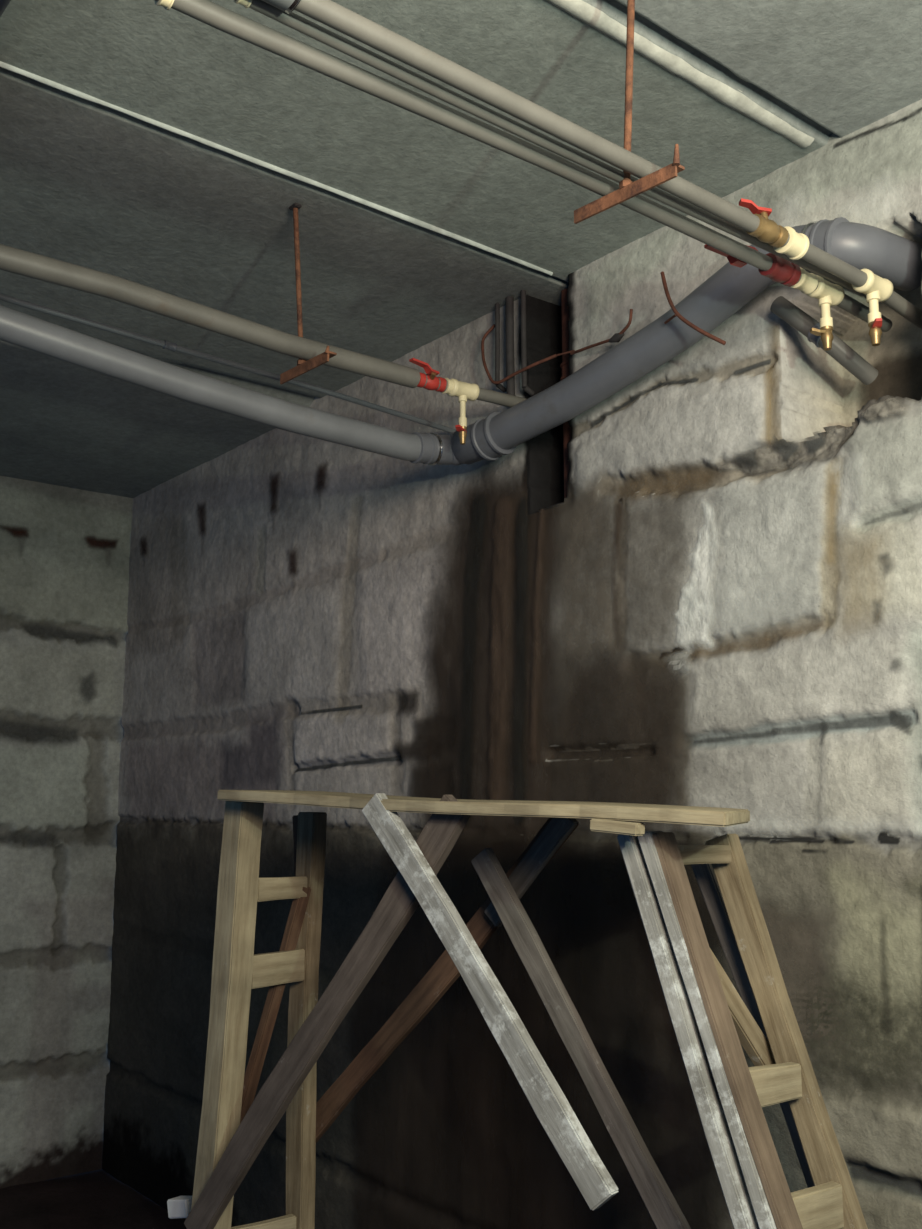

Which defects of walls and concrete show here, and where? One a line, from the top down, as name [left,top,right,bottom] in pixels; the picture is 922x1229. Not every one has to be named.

spalling [861,398,905,421]
spalling [718,427,852,474]